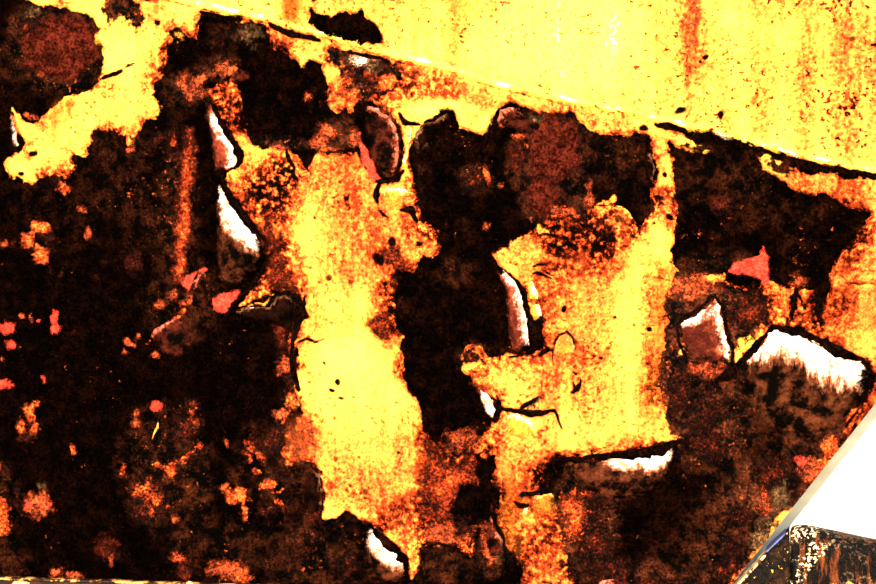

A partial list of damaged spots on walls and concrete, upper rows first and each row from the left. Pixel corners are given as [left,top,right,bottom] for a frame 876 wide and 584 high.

rust [255,215,298,293]
peeling [0,0,667,584]
rust [365,308,393,348]
rust [379,245,408,285]
peeling [534,128,874,584]
rust [413,425,479,524]